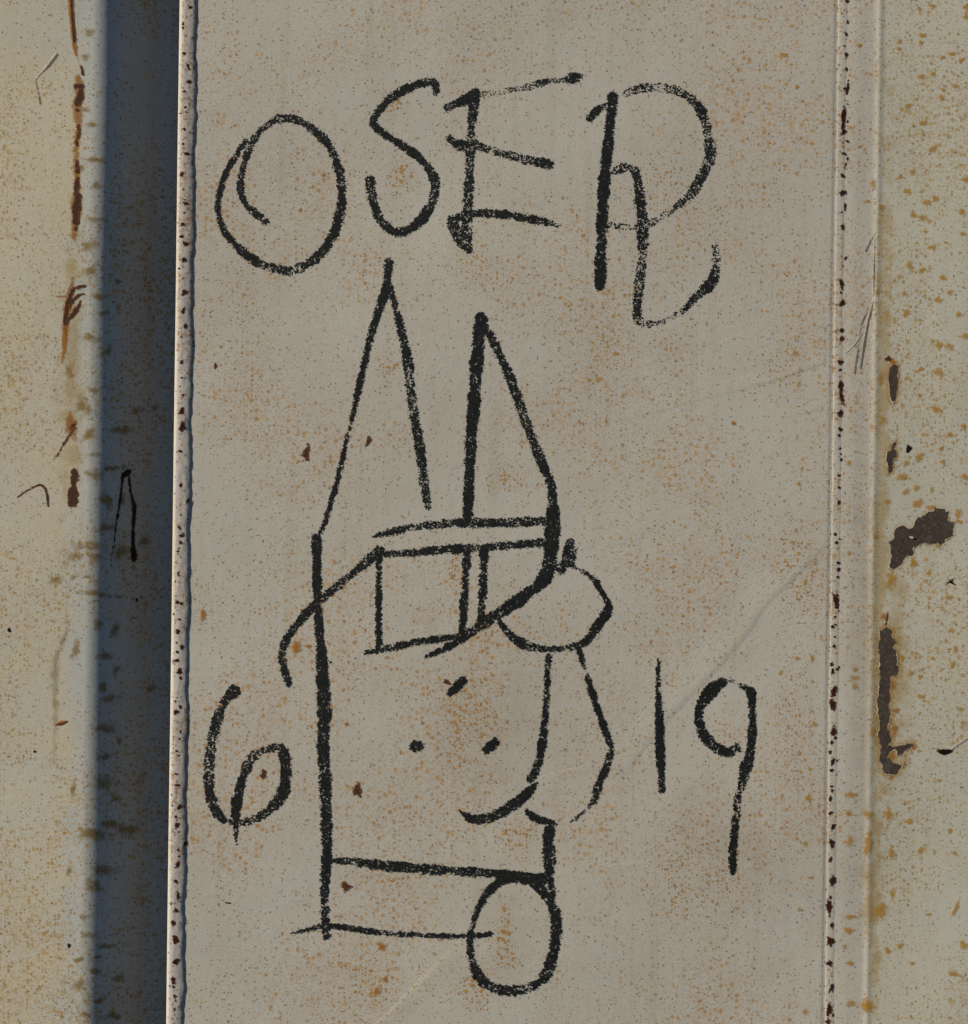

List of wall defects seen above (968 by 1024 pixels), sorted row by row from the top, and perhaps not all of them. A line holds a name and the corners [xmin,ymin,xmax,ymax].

corrosion [68,0,92,76]
corrosion [838,20,861,230]
corrosion [56,268,101,377]
corrosion [178,171,188,338]
corrosion [736,327,850,465]
peeling [887,500,962,586]
corrosion [173,600,184,680]
corrosion [765,519,856,966]
peeling [876,612,916,779]
corrosion [170,773,187,944]